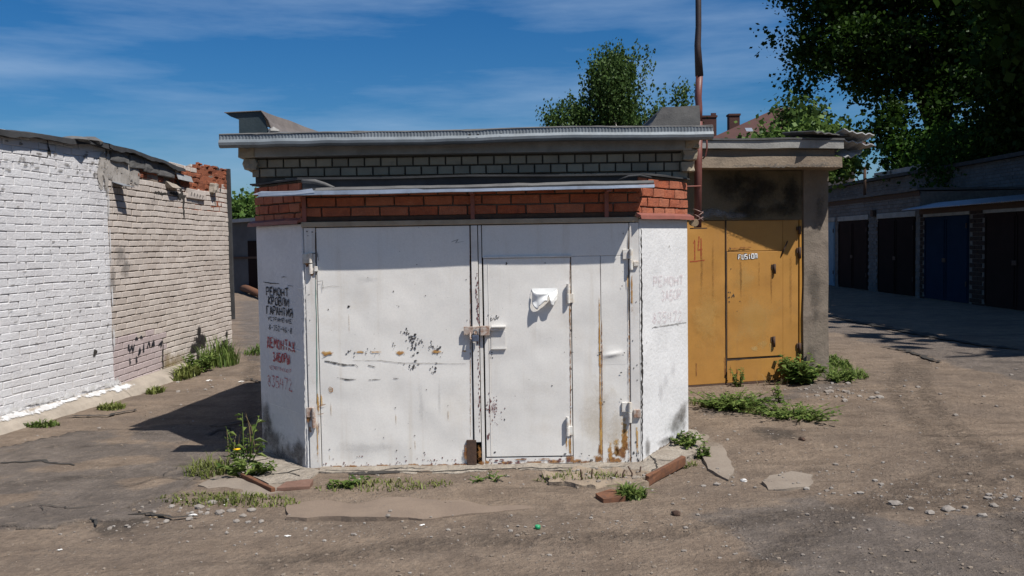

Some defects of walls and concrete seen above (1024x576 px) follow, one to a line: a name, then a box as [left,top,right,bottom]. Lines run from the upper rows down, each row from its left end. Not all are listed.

spalling [135,162,227,213]
peeling [392,328,443,373]
corrosion [502,276,638,464]
corrosion [306,387,333,454]
corrosion [408,342,489,466]